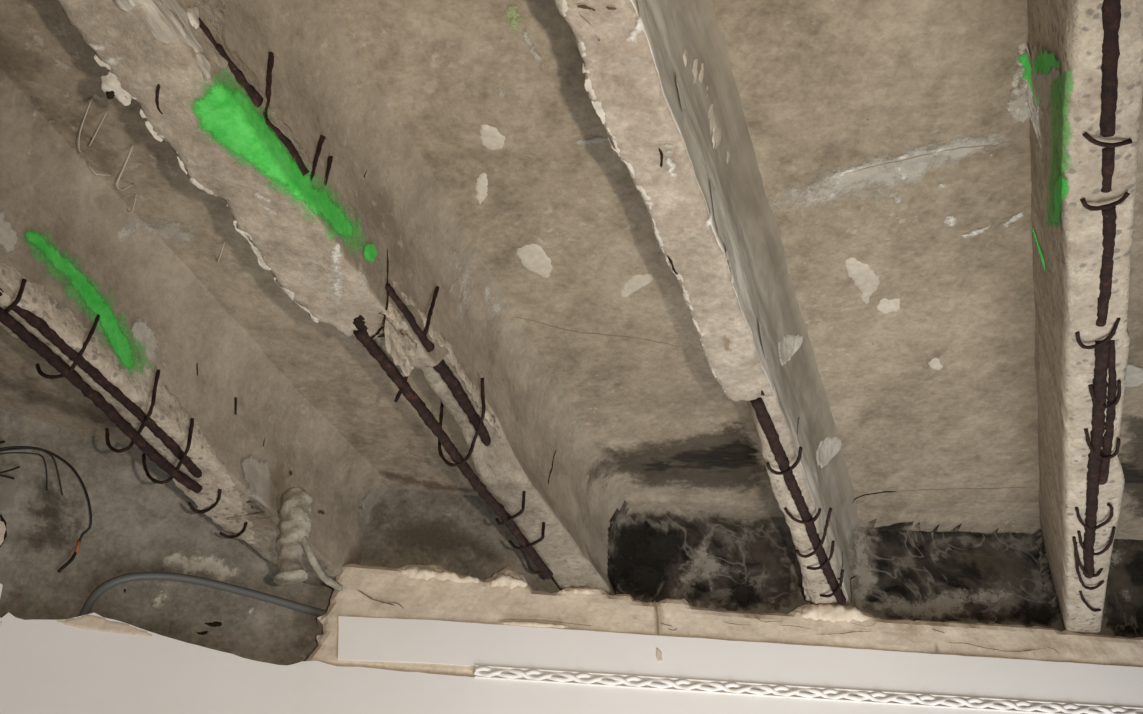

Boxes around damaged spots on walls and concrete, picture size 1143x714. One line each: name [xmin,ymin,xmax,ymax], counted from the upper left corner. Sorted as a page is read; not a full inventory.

spalling [1007,43,1061,152]
spalling [176,152,216,196]
spalling [576,39,704,346]
spalling [233,220,319,323]
spalling [0,212,255,544]
peeling [759,322,803,366]
leakage [588,423,764,489]
spalling [750,397,847,606]
peeling [57,614,152,636]
leakage [607,501,798,612]
leakage [855,519,1061,627]
leakage [1104,539,1143,637]